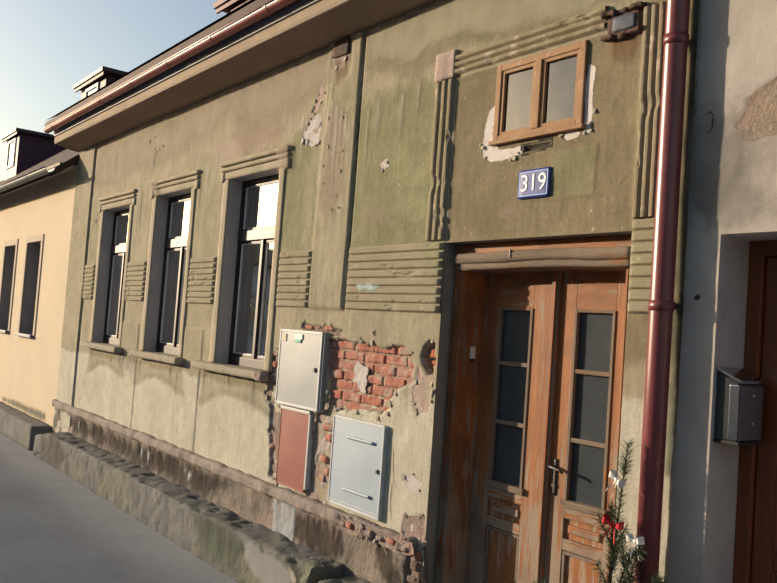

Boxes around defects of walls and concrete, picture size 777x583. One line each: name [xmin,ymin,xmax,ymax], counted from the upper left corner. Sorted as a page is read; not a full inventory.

leakage [367,0,618,66]
peeling [301,84,347,173]
flaking render [479,106,523,162]
flaking render [558,64,597,141]
flaking render [736,76,777,142]
spalling [263,347,281,486]
flaking render [300,319,439,504]
leakage [278,502,342,558]
spalling [336,513,428,583]
leakage [376,545,399,583]